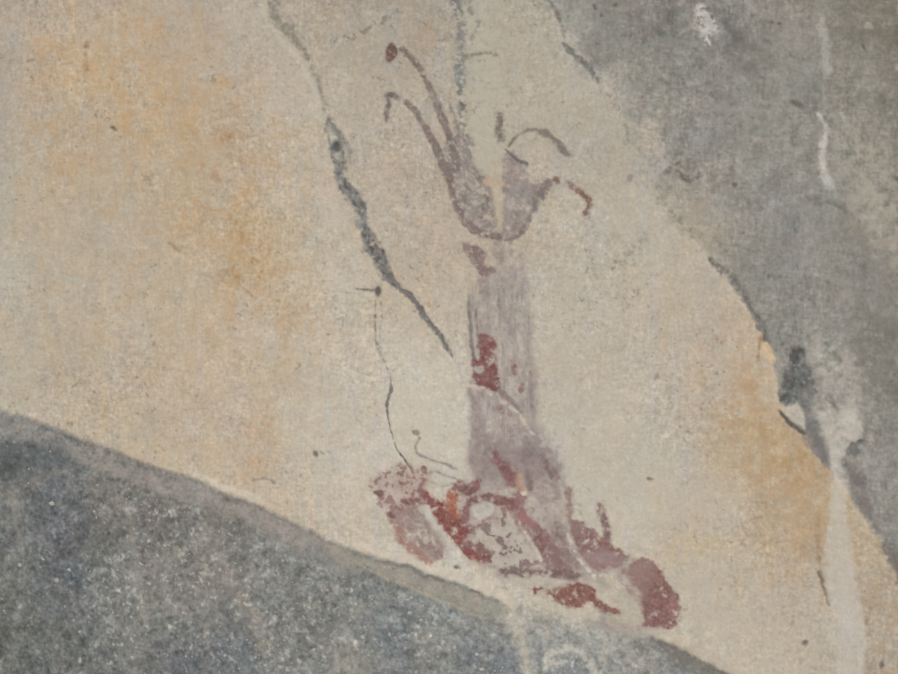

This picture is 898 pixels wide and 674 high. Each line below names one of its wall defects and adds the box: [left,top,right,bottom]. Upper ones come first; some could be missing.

spalling [675,0,721,51]
crack [265,0,455,461]
spalling [706,254,827,465]
flaking render [843,437,898,589]